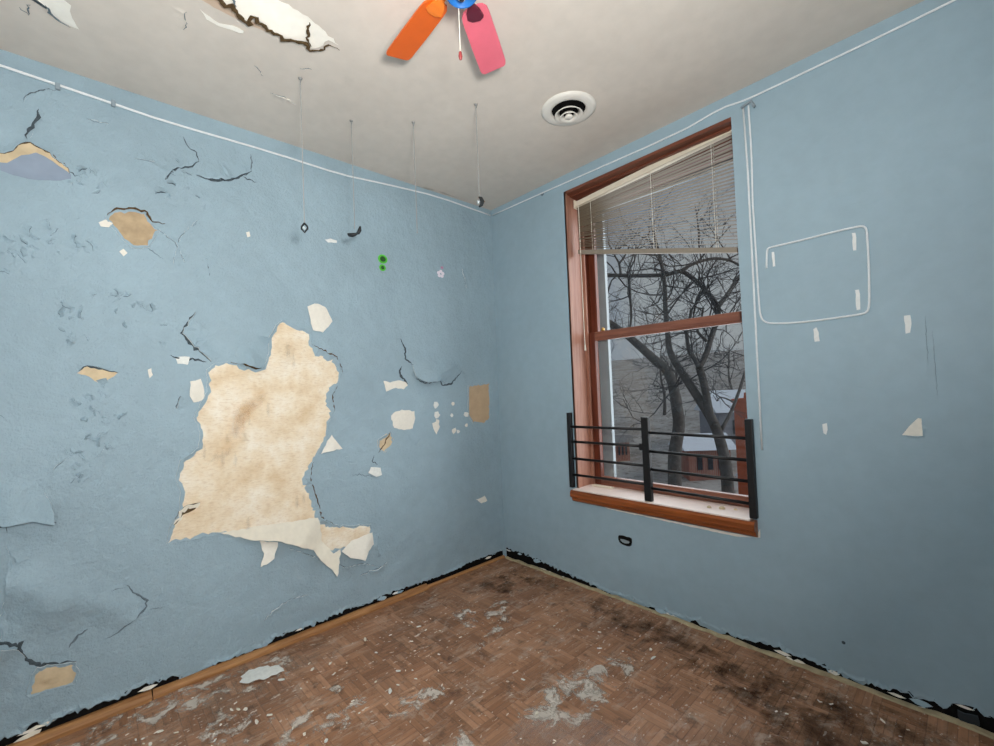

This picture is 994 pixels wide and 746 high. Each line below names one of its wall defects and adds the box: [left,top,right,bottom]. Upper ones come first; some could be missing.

peeling [19,0,78,29]
peeling [202,0,339,52]
peeling [0,85,78,181]
crack [141,137,255,183]
peeling [99,207,165,259]
peeling [74,357,121,385]
peeling [432,383,492,434]
peeling [166,304,374,576]
crack [0,641,76,698]
flaking render [0,545,994,746]